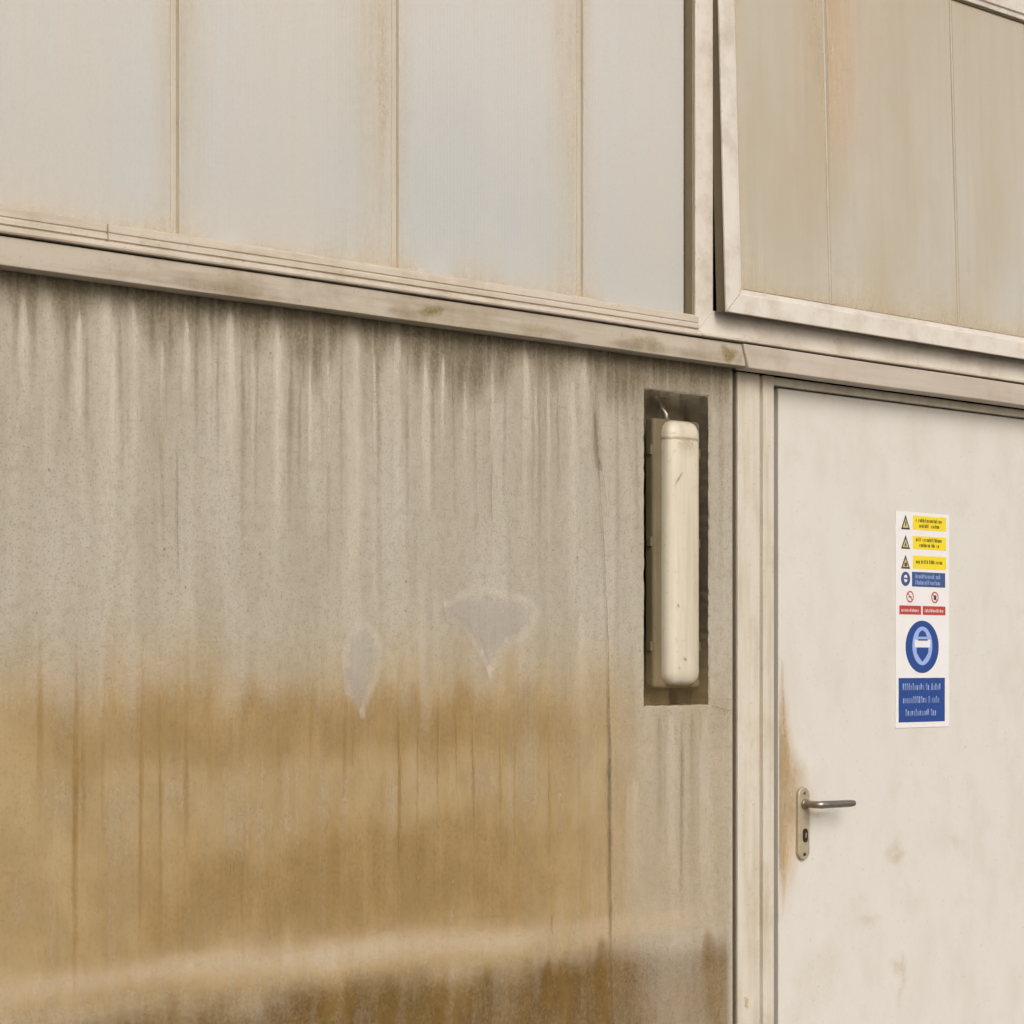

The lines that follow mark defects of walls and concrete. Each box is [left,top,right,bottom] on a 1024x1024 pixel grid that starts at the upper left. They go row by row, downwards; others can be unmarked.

water stain [5,271,727,398]
rust [779,722,796,870]